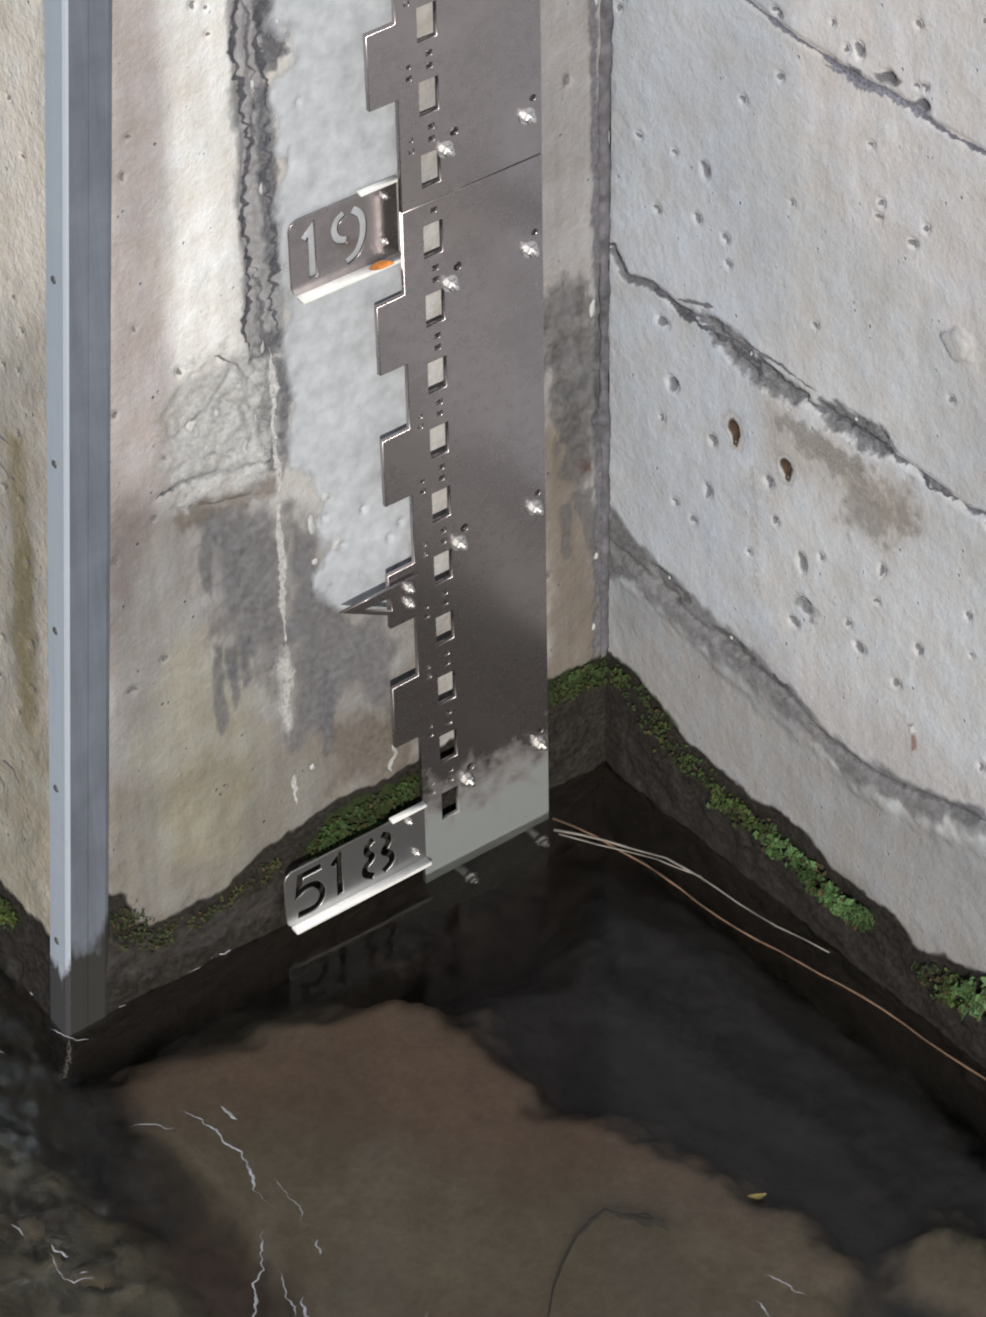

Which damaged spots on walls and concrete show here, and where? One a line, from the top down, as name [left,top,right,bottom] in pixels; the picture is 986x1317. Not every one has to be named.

water stain [253,0,288,70]
crack [227,0,288,425]
crack [588,0,986,515]
water stain [105,744,419,1014]
water stain [201,332,394,770]
water stain [440,739,455,760]
water stain [441,777,456,816]
crack [592,408,613,654]
water stain [538,652,986,1069]
water stain [607,512,986,833]
crack [772,674,872,768]
crack [904,786,986,821]